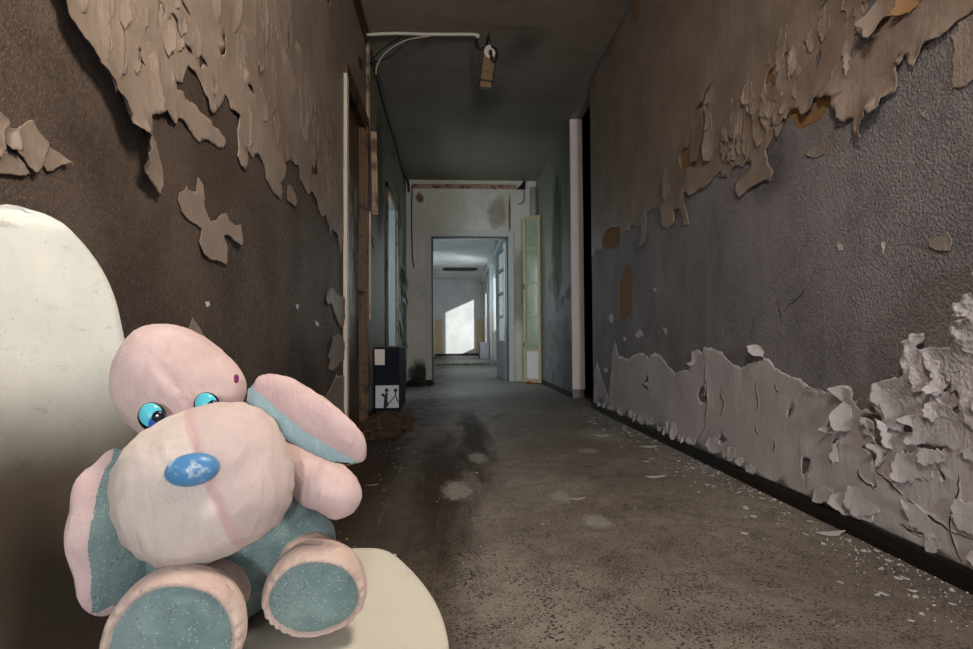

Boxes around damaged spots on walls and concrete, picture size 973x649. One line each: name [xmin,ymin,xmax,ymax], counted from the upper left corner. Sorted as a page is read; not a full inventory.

peeling [0,112,74,176]
peeling [66,0,366,265]
peeling [590,0,973,256]
peeling [325,288,345,414]
flaking render [609,264,632,323]
peeling [593,290,973,569]